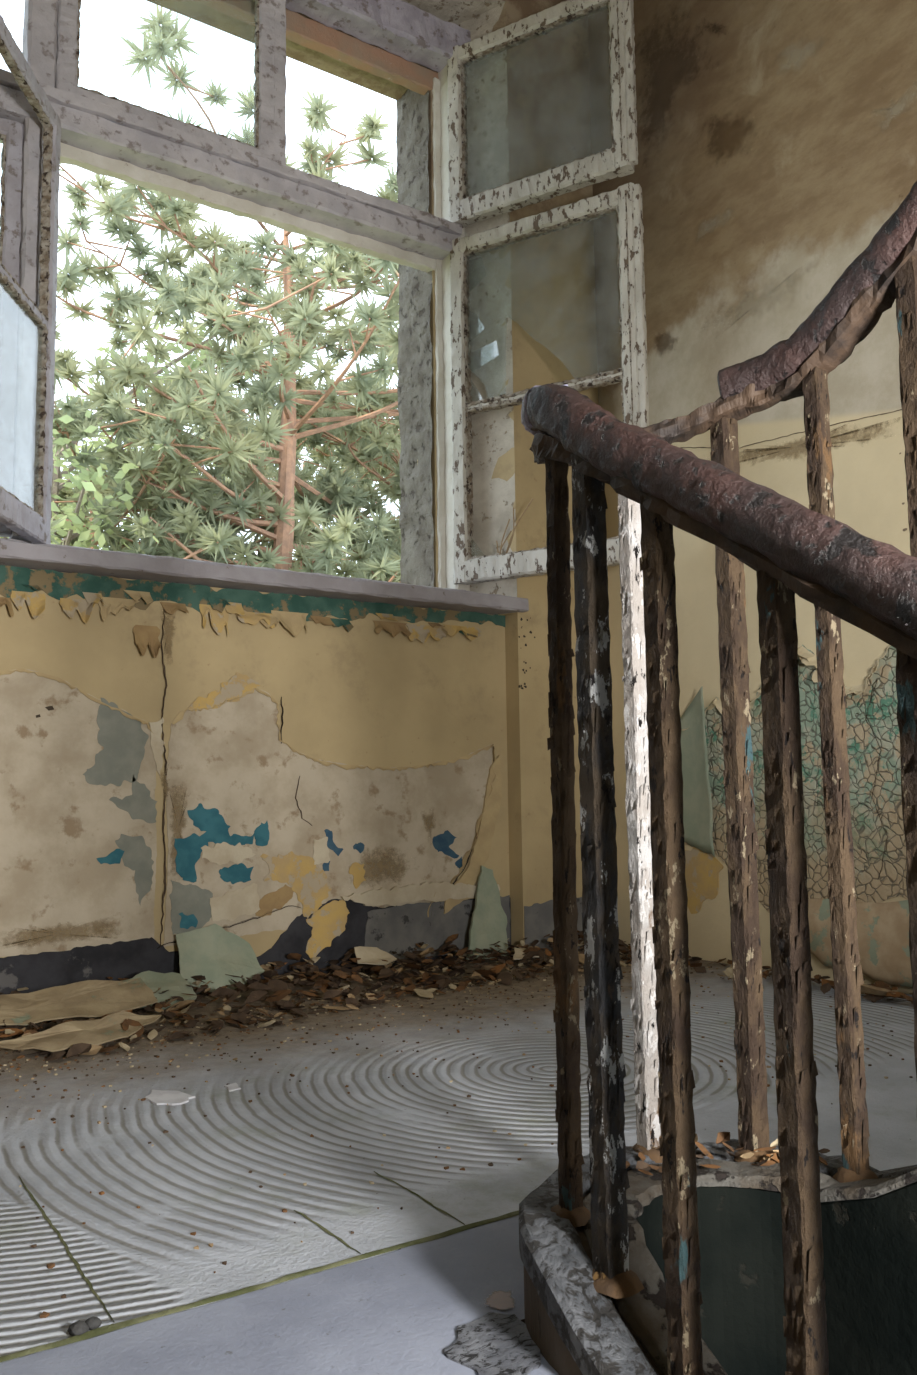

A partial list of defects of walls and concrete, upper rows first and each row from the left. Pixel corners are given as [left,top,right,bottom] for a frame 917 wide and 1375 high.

peeling [0,584,354,637]
peeling [373,613,478,643]
crack [157,605,176,949]
peeling [0,668,502,957]
crack [223,905,301,928]
peeling [681,686,728,866]
peeling [750,686,770,913]
peeling [798,645,829,899]
peeling [845,645,908,903]